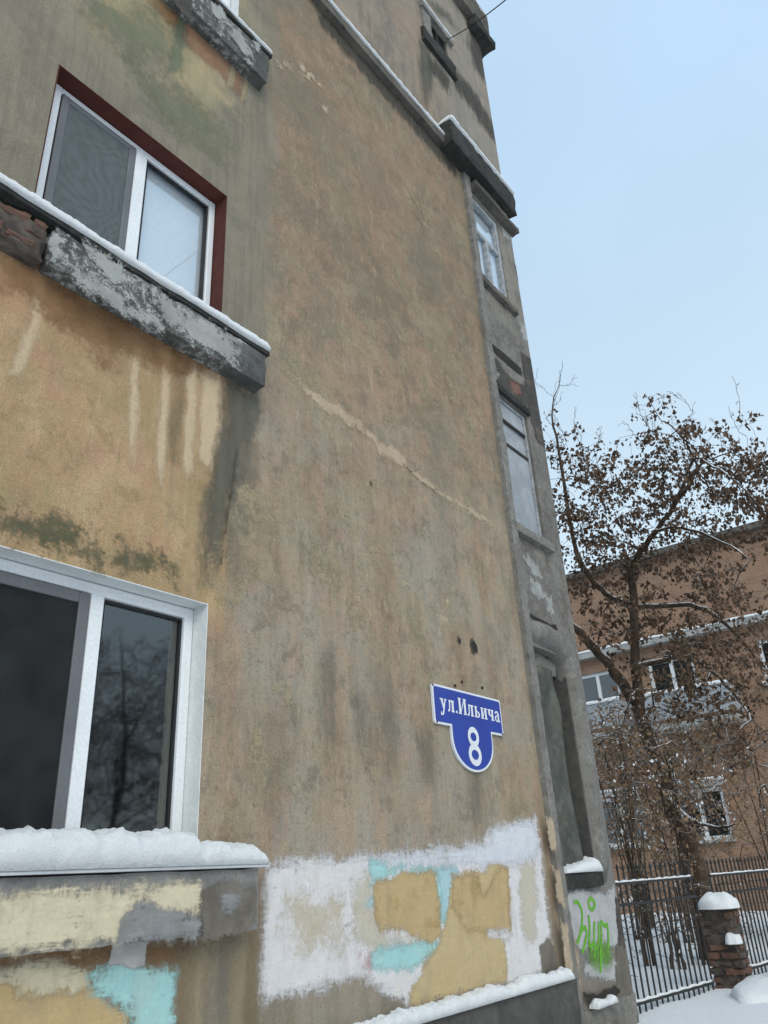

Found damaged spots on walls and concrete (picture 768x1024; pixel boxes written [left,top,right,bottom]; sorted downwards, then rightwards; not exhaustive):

peeling [211,2,261,56]
peeling [0,203,242,367]
leakage [8,296,42,375]
leakage [128,354,142,447]
leakage [157,361,259,567]
crack [289,373,495,528]
mould [0,506,176,589]